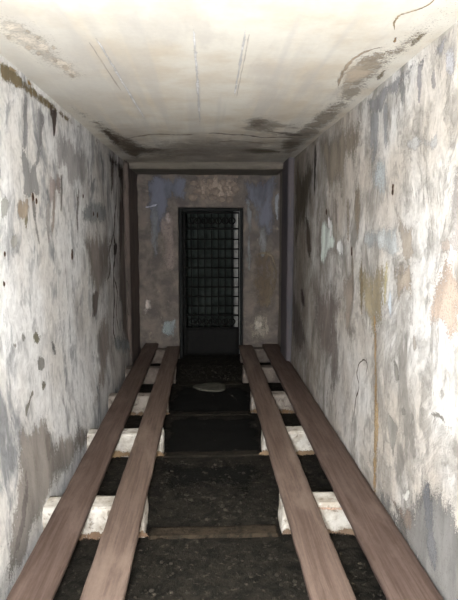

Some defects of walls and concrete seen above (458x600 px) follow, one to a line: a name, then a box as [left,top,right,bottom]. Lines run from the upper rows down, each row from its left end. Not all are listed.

spalling [1,18,81,78]
crack [393,0,434,43]
water stain [105,115,304,160]
water stain [0,63,124,317]
rust [358,258,389,494]